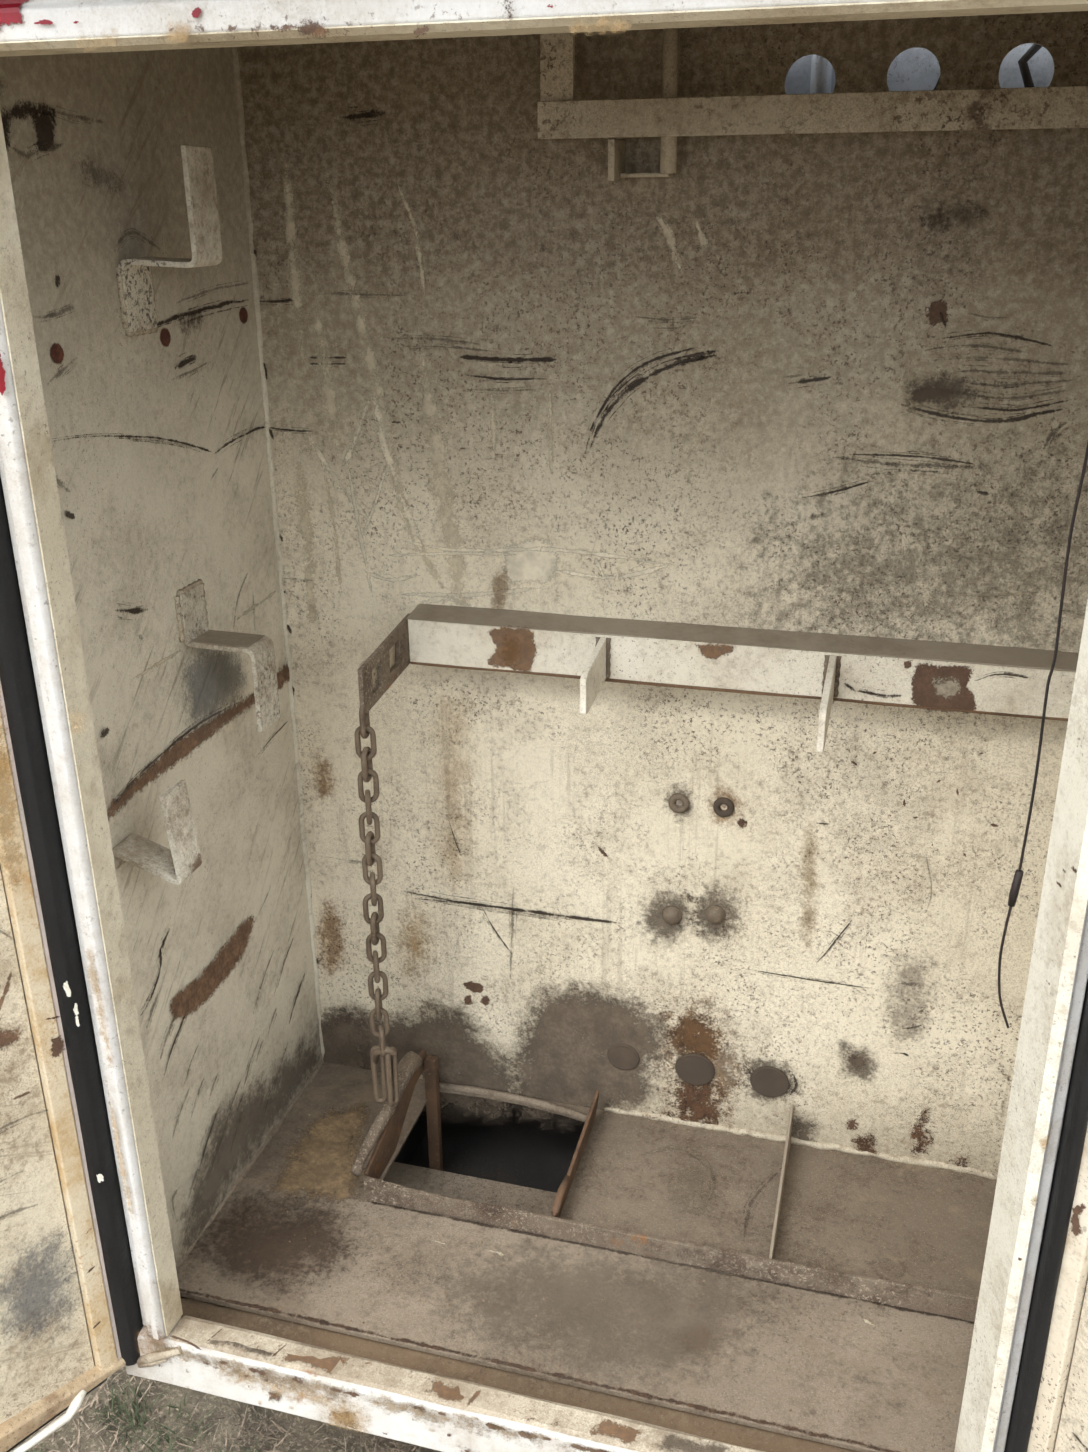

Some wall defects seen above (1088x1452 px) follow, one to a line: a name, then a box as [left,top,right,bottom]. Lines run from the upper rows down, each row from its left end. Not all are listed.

peeling [0,0,53,26]
corrosion [488,625,537,672]
corrosion [911,663,977,714]
water stain [637,881,744,944]
corrosion [0,972,21,1048]
corrosion [654,993,748,1126]